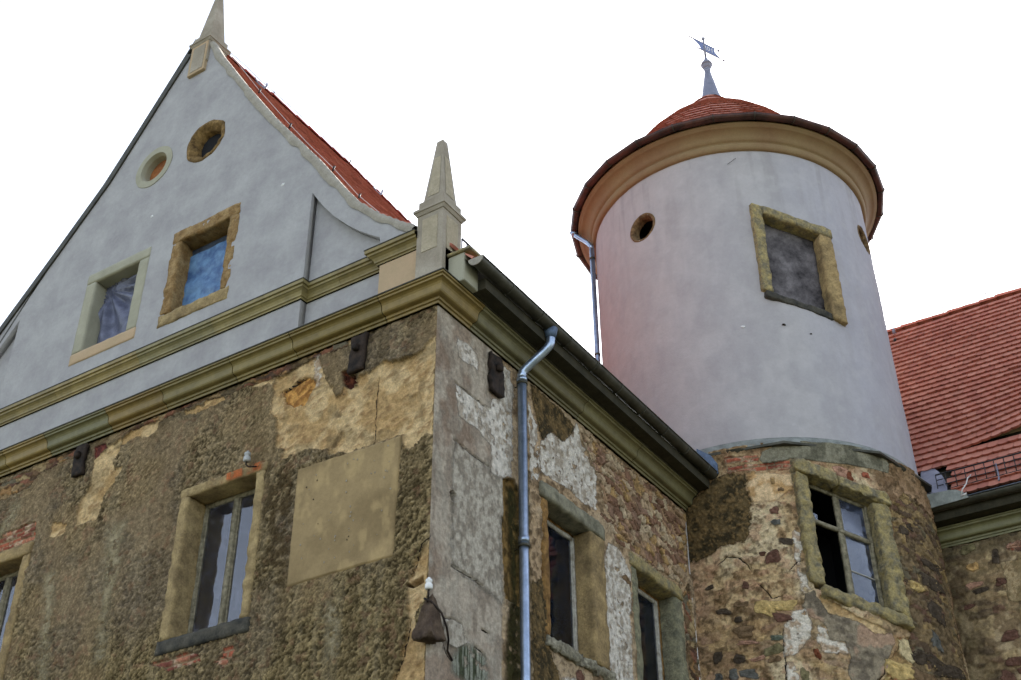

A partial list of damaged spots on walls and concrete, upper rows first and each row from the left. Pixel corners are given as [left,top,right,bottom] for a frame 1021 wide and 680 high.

peeling [457,339,478,369]
flaking render [184,397,225,415]
flaking render [252,336,436,458]
flaking render [50,421,160,538]
peeling [456,367,519,607]
flaking render [0,521,36,552]
spalling [991,540,1021,564]
crack [717,556,781,599]